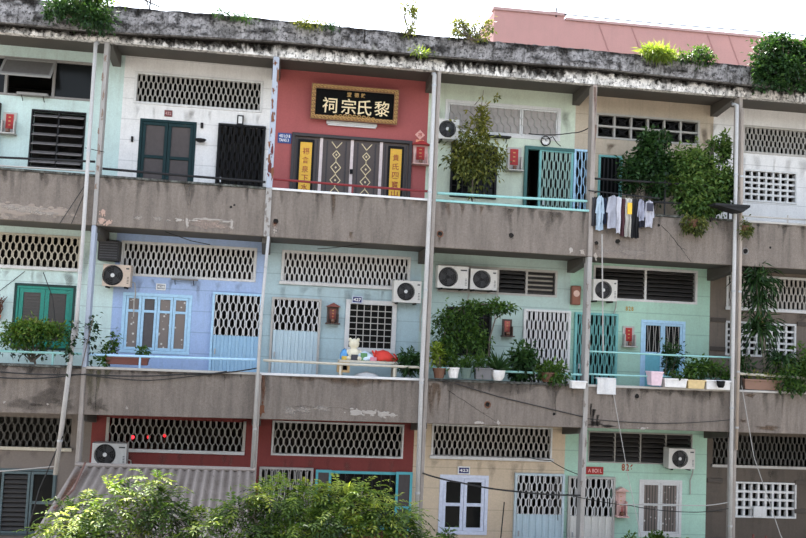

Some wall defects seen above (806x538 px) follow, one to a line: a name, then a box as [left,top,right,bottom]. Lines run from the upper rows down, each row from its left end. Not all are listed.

spalling [0,201,77,220]
peeling [175,218,233,230]
spalling [344,408,398,418]